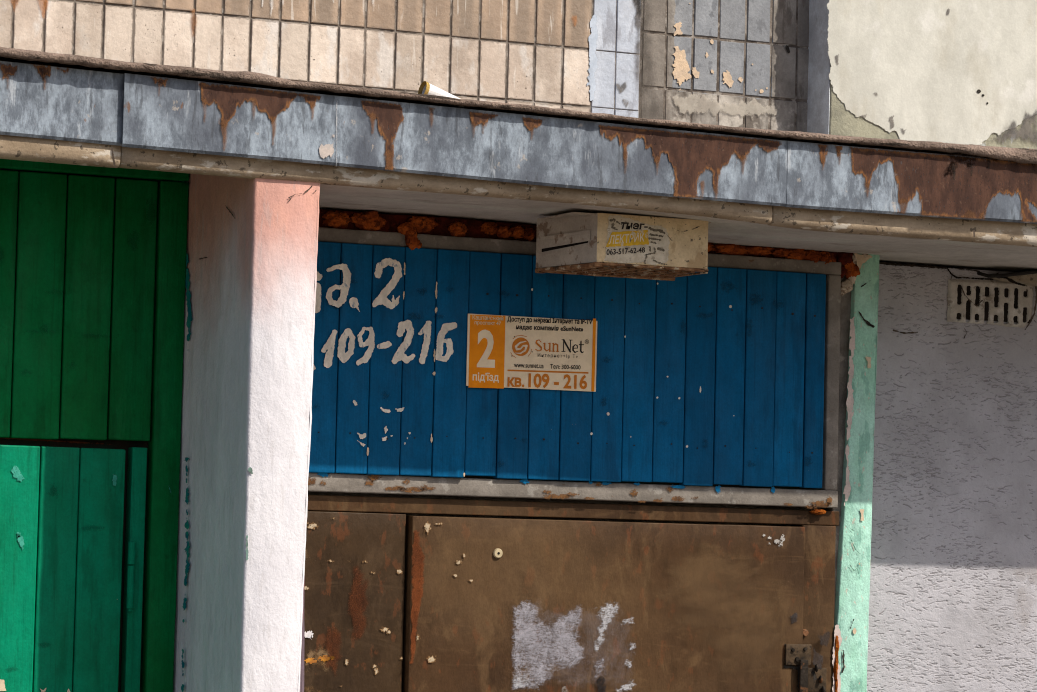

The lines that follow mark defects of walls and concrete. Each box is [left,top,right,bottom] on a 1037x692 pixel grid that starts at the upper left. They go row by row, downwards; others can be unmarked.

peeling [672,22,743,90]
corrosion [199,82,321,144]
corrosion [362,100,404,170]
corrosion [599,125,781,198]
corrosion [818,144,1037,222]
peeling [843,312,875,506]
corrosion [304,655,334,664]
peeling [832,625,856,692]